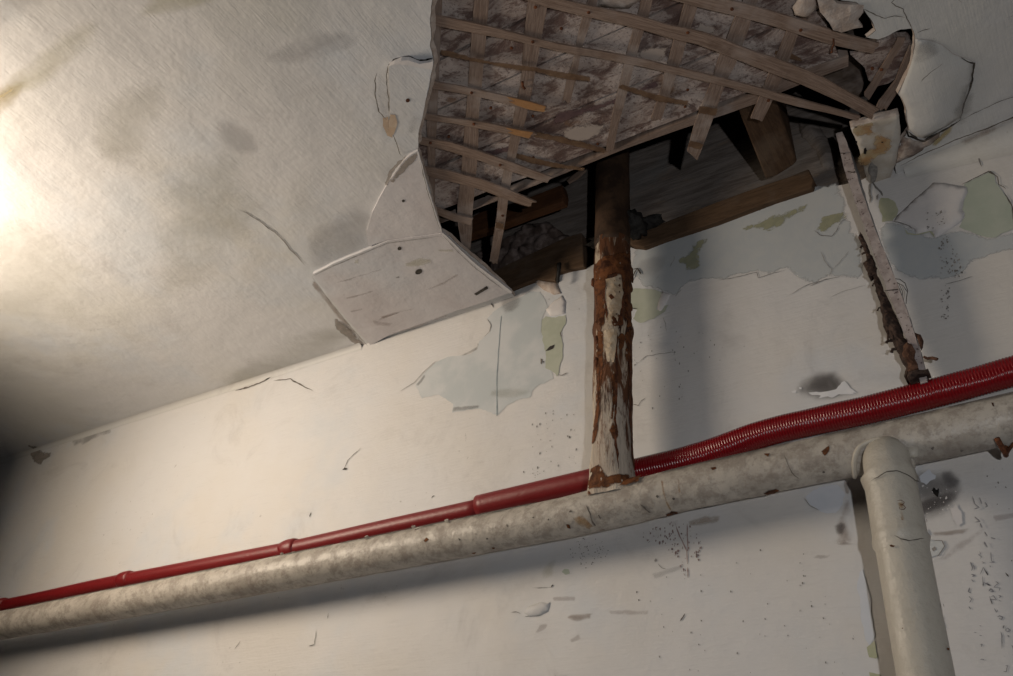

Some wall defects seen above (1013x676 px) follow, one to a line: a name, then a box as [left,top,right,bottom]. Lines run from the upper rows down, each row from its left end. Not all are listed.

crack [865,0,928,32]
crack [905,58,1013,164]
peeling [385,0,566,415]
peeling [631,184,862,323]
peeling [879,171,1013,284]
rust [588,252,641,495]